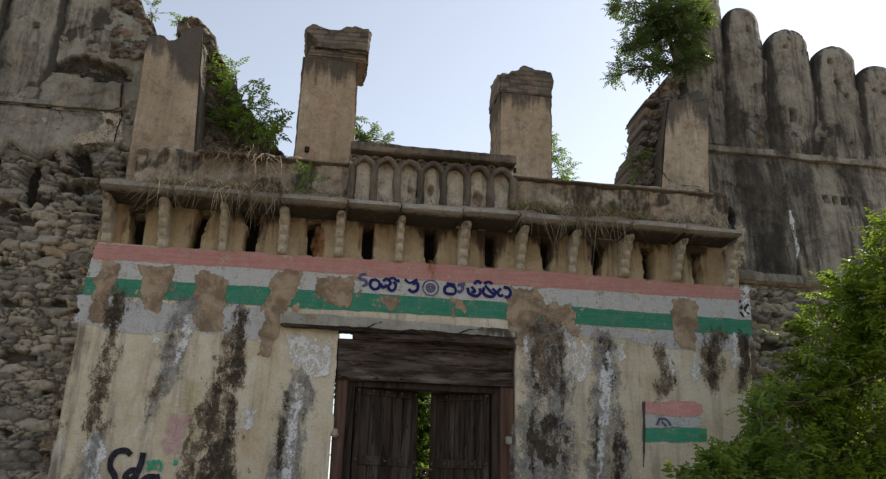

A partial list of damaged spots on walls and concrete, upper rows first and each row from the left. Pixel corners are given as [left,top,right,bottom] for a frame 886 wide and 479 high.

peeling [88,259,121,323]
leakage [79,285,133,479]
peeling [135,264,177,313]
leakage [144,296,200,424]
peeling [191,270,229,332]
leakage [176,304,251,479]
peeling [257,269,302,357]
leakage [266,369,315,479]
peeling [506,286,581,347]
leakage [510,315,632,479]
peeling [670,298,700,351]
leakage [691,326,761,394]